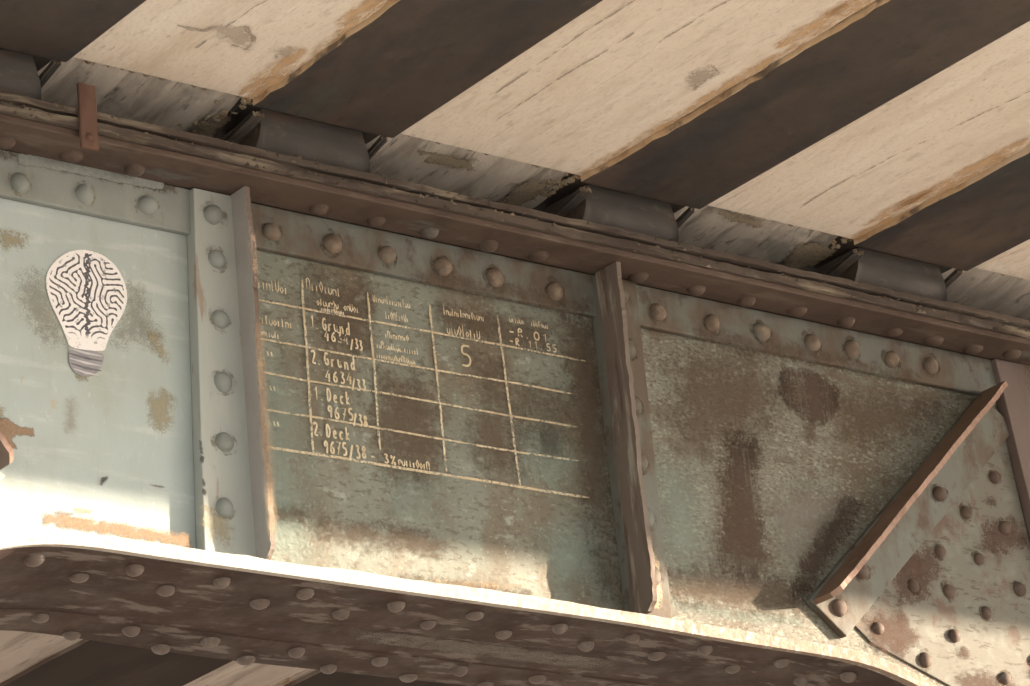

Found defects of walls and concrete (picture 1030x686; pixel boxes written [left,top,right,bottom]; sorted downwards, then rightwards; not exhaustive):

peeling [0,407,34,449]
rust [44,507,193,548]
rust [863,547,941,659]
rust [957,673,1015,686]